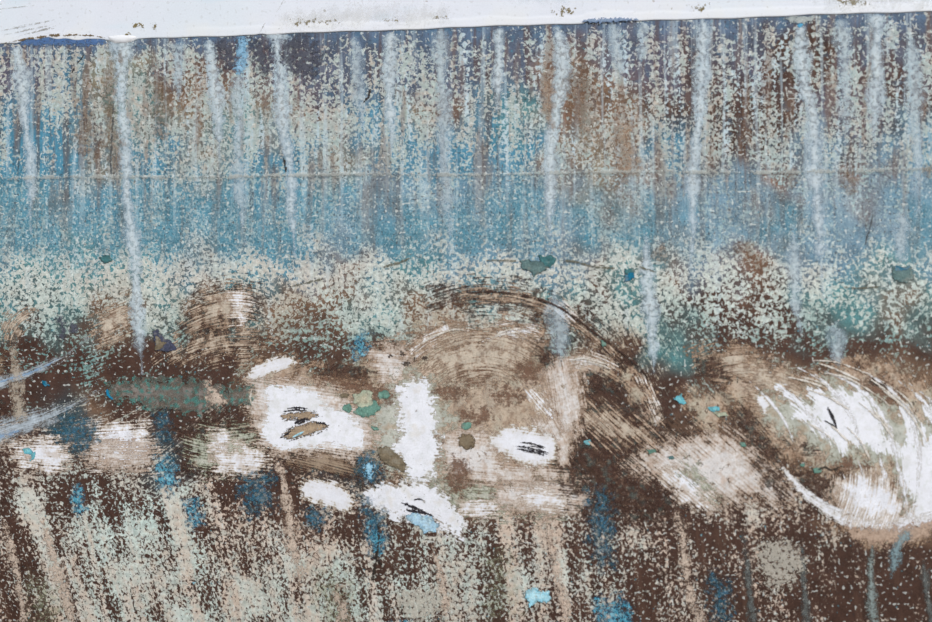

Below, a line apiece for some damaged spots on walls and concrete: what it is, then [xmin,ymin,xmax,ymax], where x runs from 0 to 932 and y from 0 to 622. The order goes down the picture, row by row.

water stain [13,47,37,205]
water stain [110,23,157,351]
water stain [205,36,248,140]
water stain [269,34,296,237]
water stain [382,33,397,141]
water stain [492,29,504,108]
water stain [543,28,571,235]
water stain [686,2,712,252]
water stain [794,27,825,255]
water stain [866,15,885,131]
water stain [641,237,659,363]
water stain [0,350,51,419]